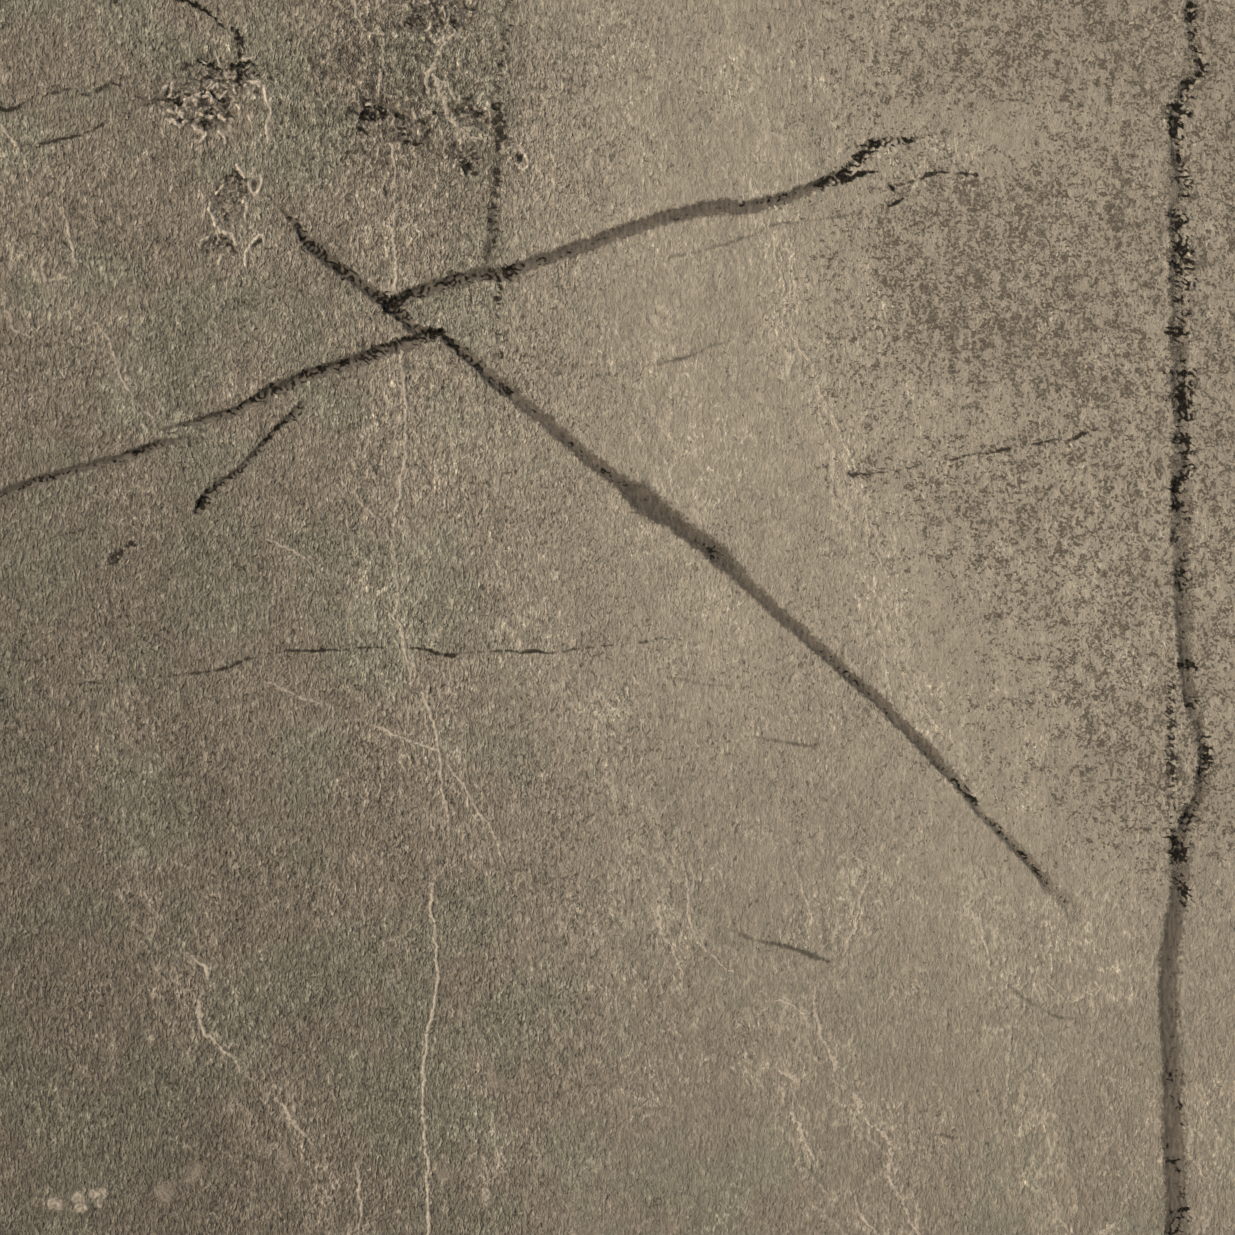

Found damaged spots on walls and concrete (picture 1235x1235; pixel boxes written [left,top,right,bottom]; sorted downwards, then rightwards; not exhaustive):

crack [0,0,1065,903]
crack [949,431,1088,461]
crack [1157,0,1212,1235]